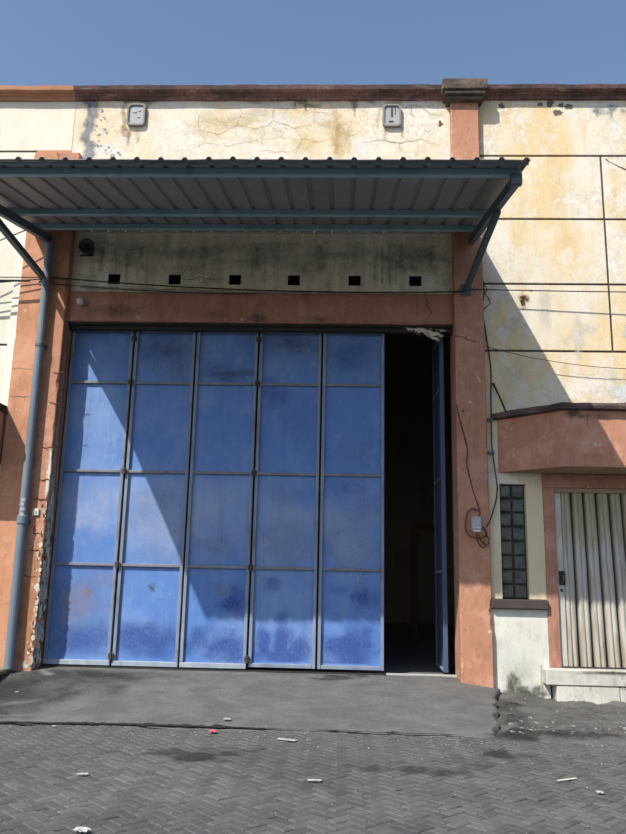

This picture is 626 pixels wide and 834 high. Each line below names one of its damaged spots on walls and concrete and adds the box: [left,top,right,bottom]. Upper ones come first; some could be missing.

damp [81,101,98,159]
crack [195,104,439,152]
spalling [537,100,573,116]
spalling [406,328,447,342]
peeling [22,450,56,669]